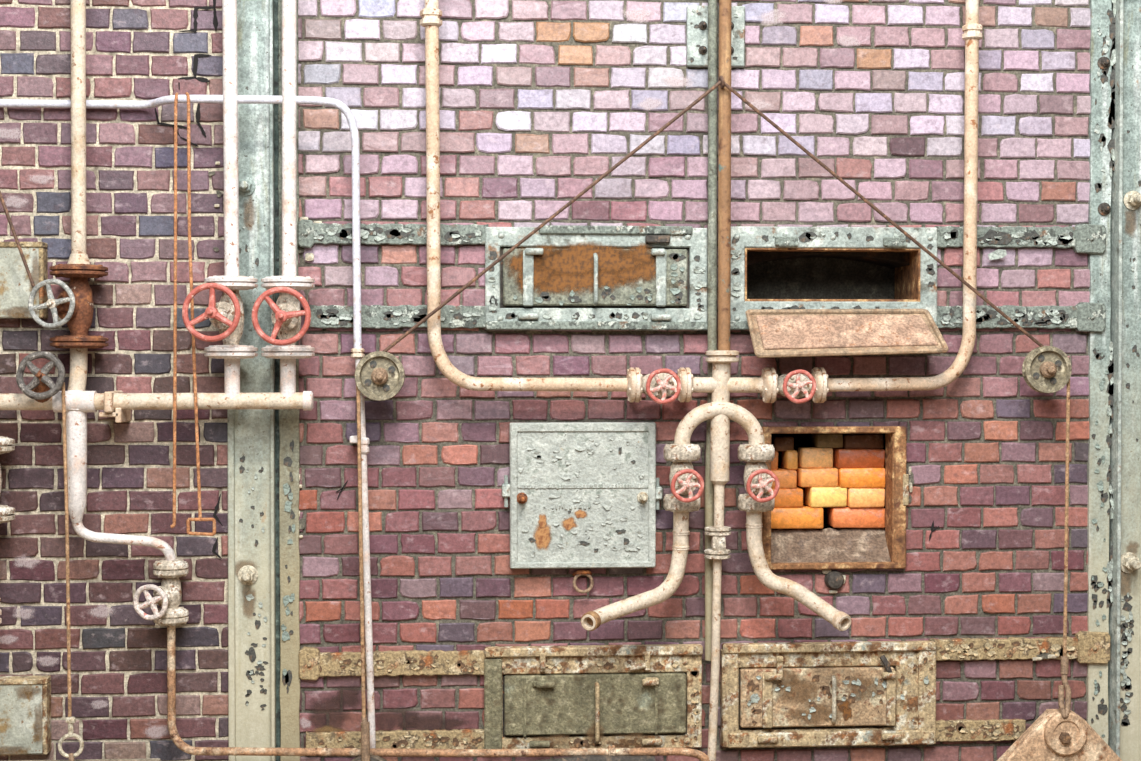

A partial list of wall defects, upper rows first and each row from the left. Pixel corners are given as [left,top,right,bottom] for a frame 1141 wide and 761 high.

peeling [1094,0,1130,193]
corrosion [509,242,656,294]
peeling [283,440,305,544]
corrosion [535,510,587,549]
peeling [1091,342,1140,726]
peeling [281,565,295,641]
peeling [245,594,268,710]
peeling [282,669,292,693]
corrosion [838,699,852,721]